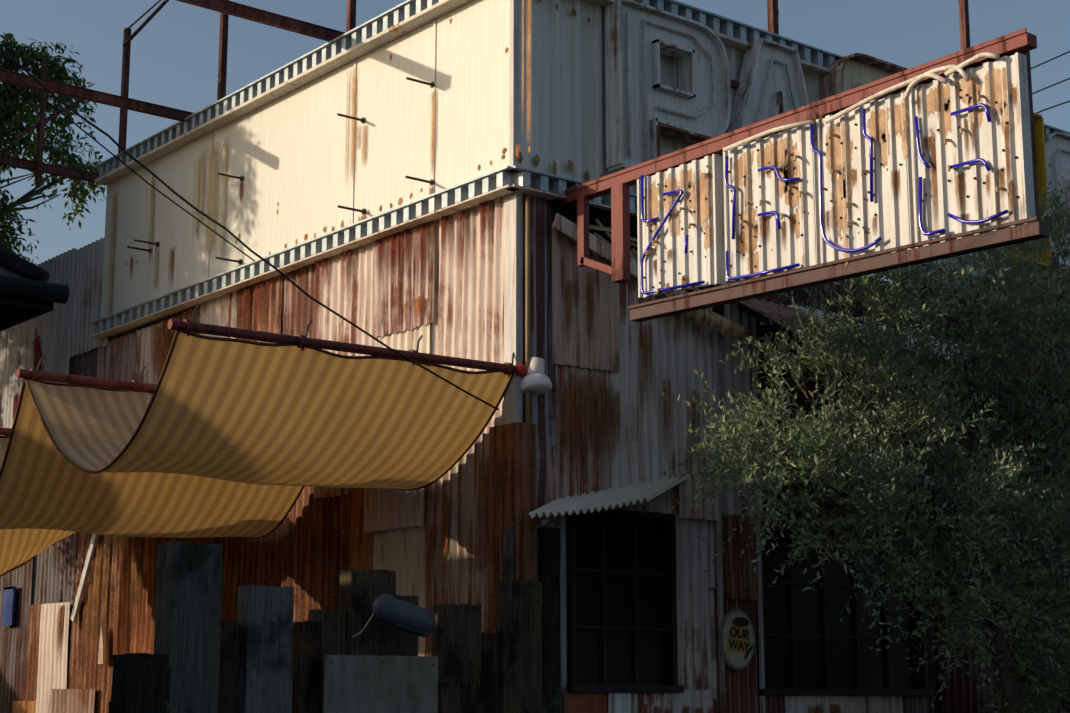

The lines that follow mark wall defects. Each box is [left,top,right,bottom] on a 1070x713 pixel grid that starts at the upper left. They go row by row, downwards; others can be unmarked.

rust [522,0,542,131]
rust [345,72,366,174]
rust [478,145,540,170]
rust [552,160,603,182]
rust [316,249,351,282]
rust [284,187,433,248]
rust [376,223,427,268]
rust [441,209,465,259]
rust [480,201,489,229]
rust [641,325,671,437]
rust [606,389,620,458]
rust [86,537,183,644]